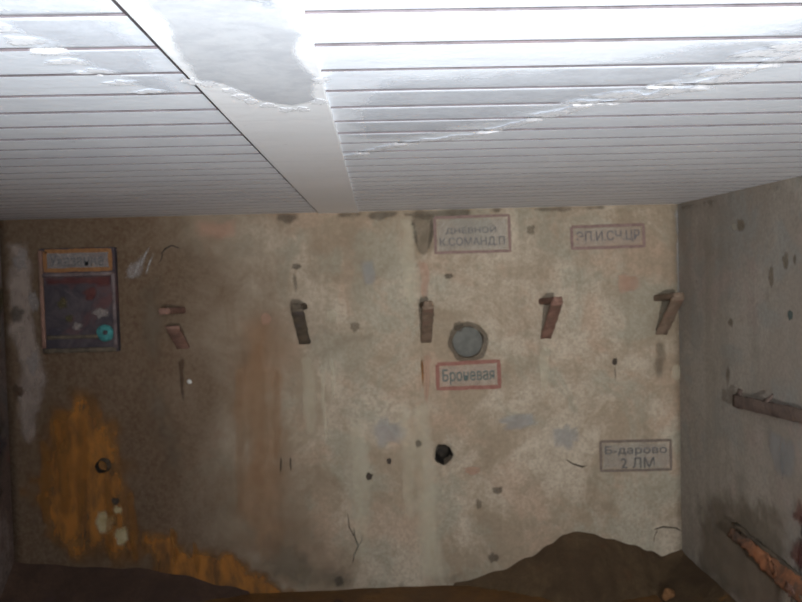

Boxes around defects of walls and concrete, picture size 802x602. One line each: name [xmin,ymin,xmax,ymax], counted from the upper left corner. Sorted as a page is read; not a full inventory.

peeling [146,0,329,113]
rust [37,395,293,594]
spalling [791,504,802,575]